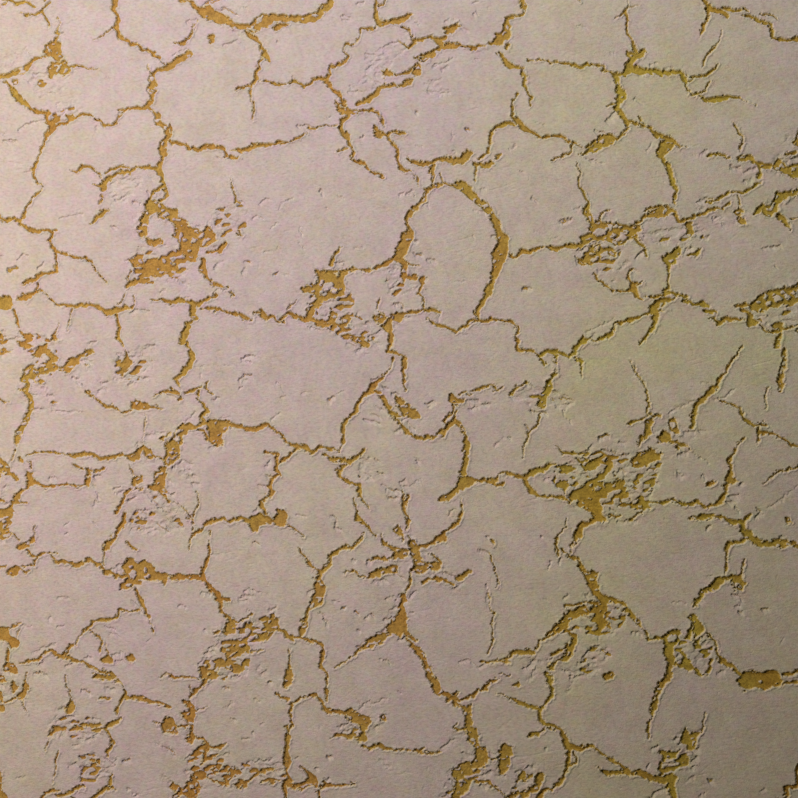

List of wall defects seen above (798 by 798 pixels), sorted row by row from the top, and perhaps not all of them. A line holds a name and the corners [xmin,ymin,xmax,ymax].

spalling [96,177,294,396]
spalling [299,235,443,392]
crack [0,0,798,503]
spalling [558,121,798,274]
spalling [0,308,101,545]
spalling [522,399,711,511]
spalling [152,587,295,798]
crack [0,447,679,798]
spalling [289,692,579,798]
crack [540,436,798,740]
crack [776,763,798,798]